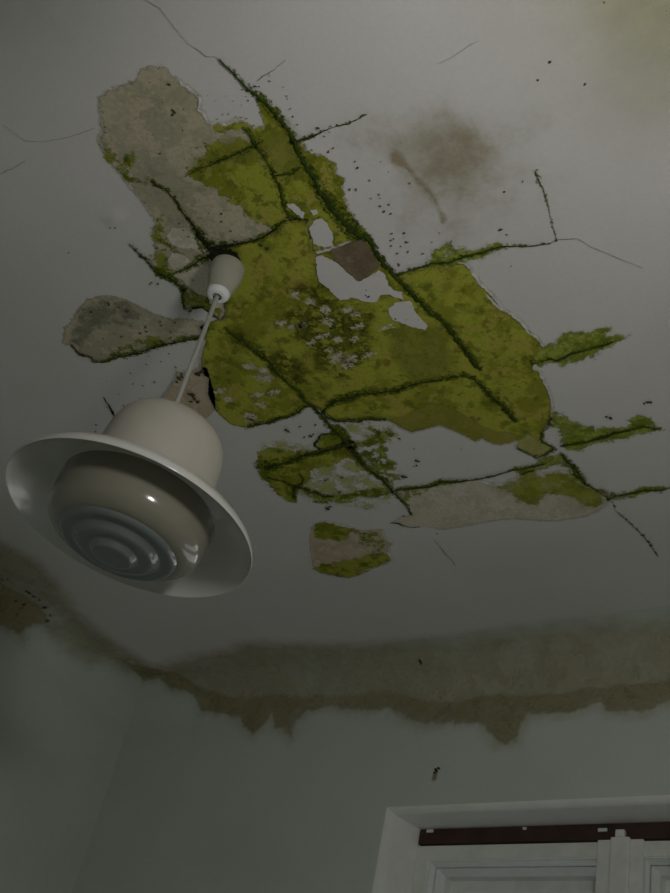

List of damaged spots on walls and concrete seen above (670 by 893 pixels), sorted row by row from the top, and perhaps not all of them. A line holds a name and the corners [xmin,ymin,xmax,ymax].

crack [71,1,518,516]
spalling [62,65,612,579]
crack [517,416,658,556]